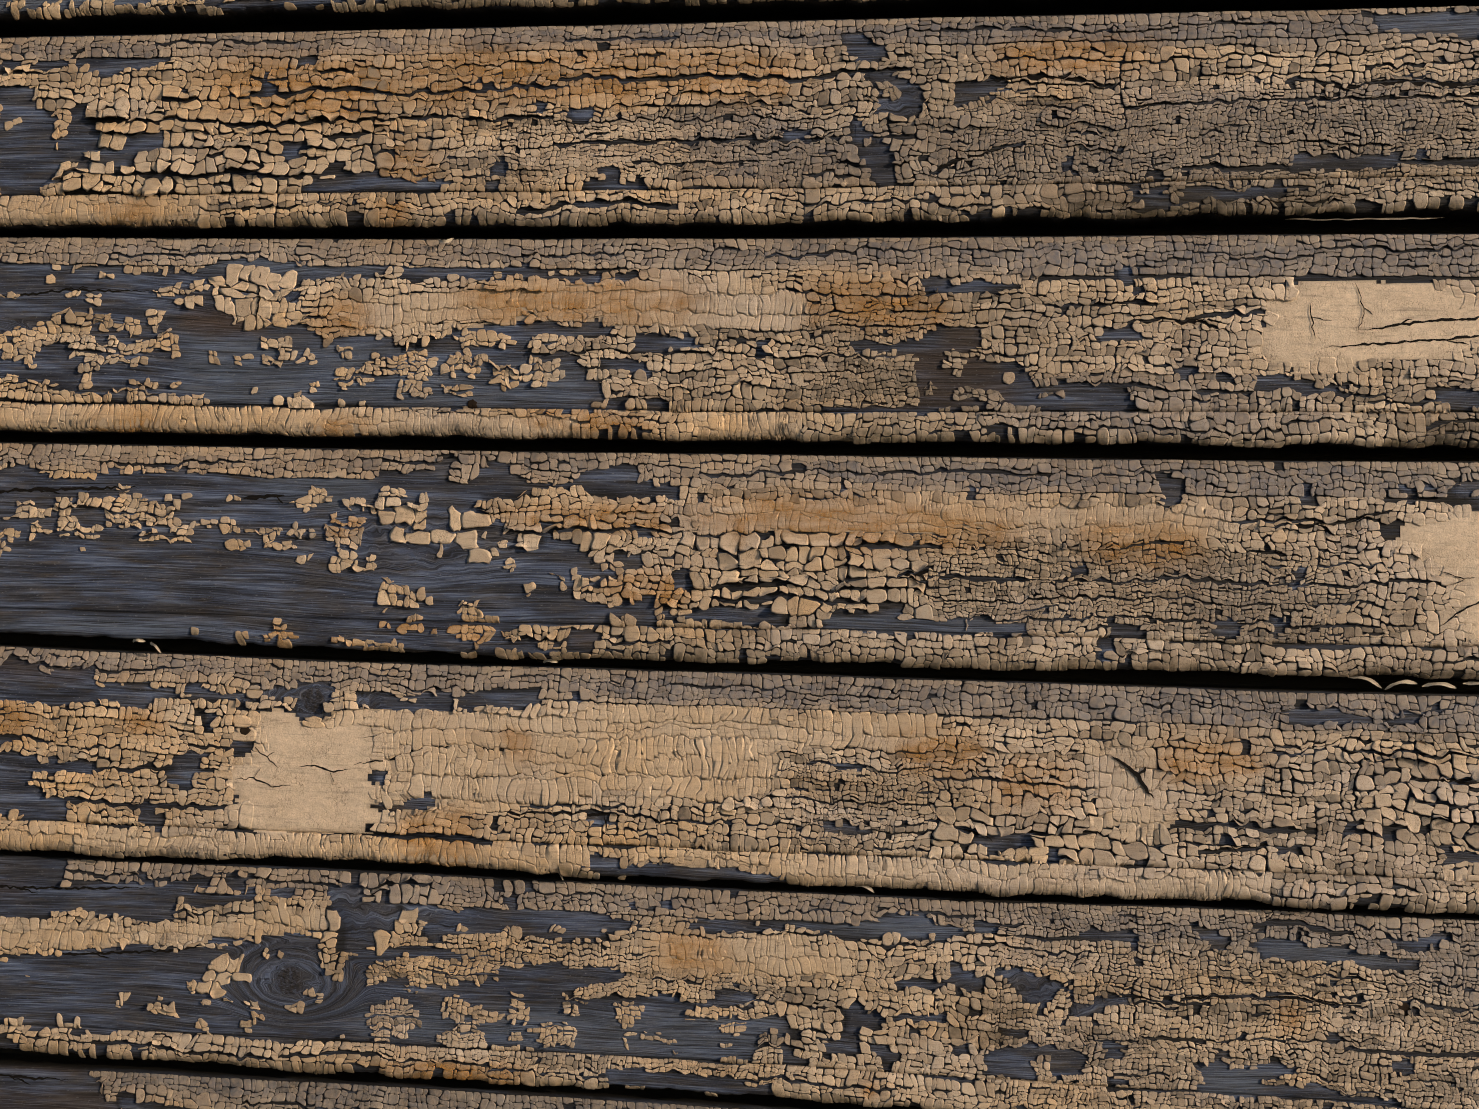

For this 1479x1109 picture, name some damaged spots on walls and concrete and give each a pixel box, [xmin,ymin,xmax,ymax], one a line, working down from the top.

peeling [0,48,176,206]
crack [987,71,1109,84]
crack [1294,59,1475,93]
peeling [0,252,713,422]
peeling [812,261,1138,432]
crack [1310,283,1479,348]
peeling [0,450,788,840]
crack [238,726,722,829]
crack [1112,756,1154,798]
crack [1271,743,1479,785]
peeling [0,726,1148,1109]
peeling [1190,1041,1425,1109]